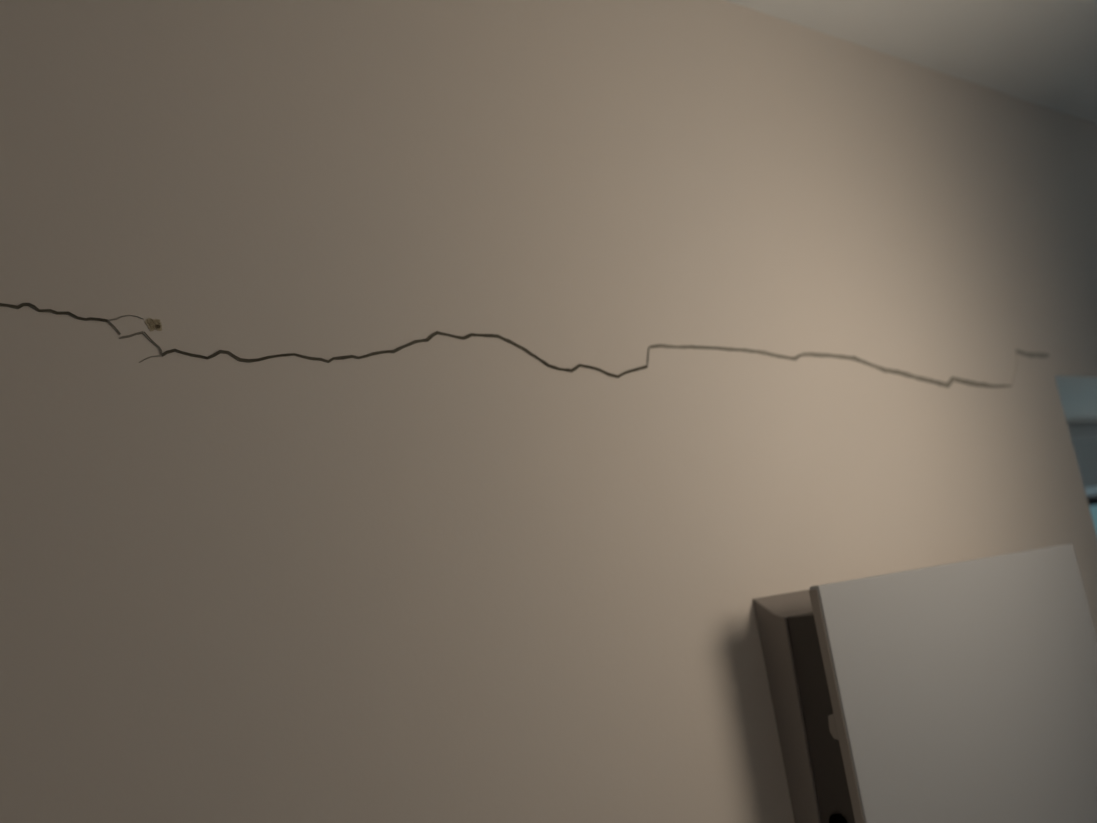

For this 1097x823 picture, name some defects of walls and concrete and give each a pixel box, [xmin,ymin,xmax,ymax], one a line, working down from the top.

crack [0,303,1050,388]